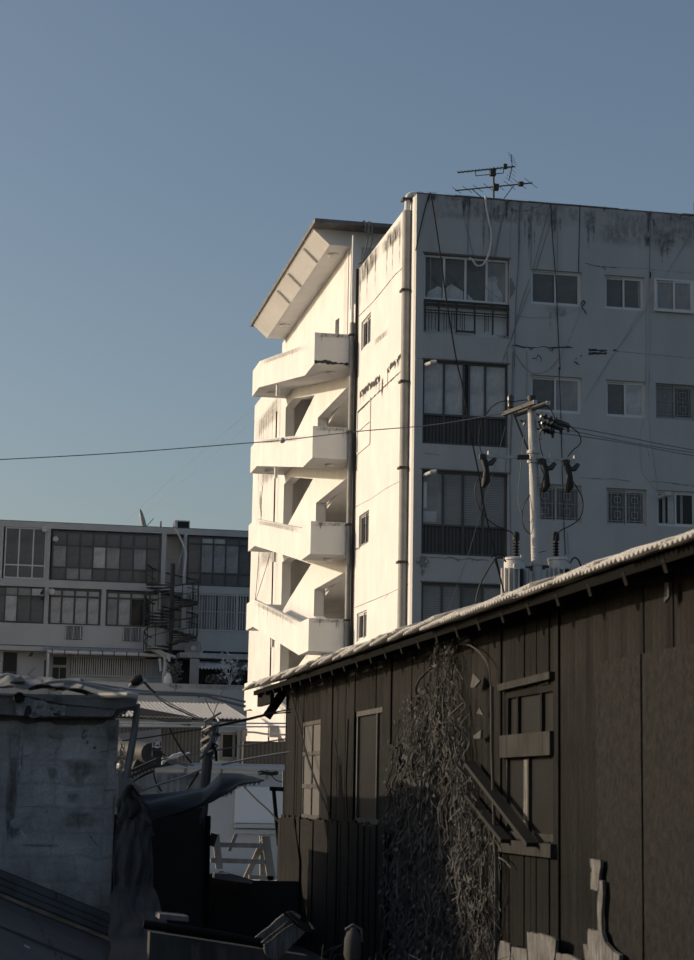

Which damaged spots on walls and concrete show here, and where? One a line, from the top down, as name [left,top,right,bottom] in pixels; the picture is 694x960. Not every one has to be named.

leakage [360,228,400,286]
spalling [16,697,66,718]